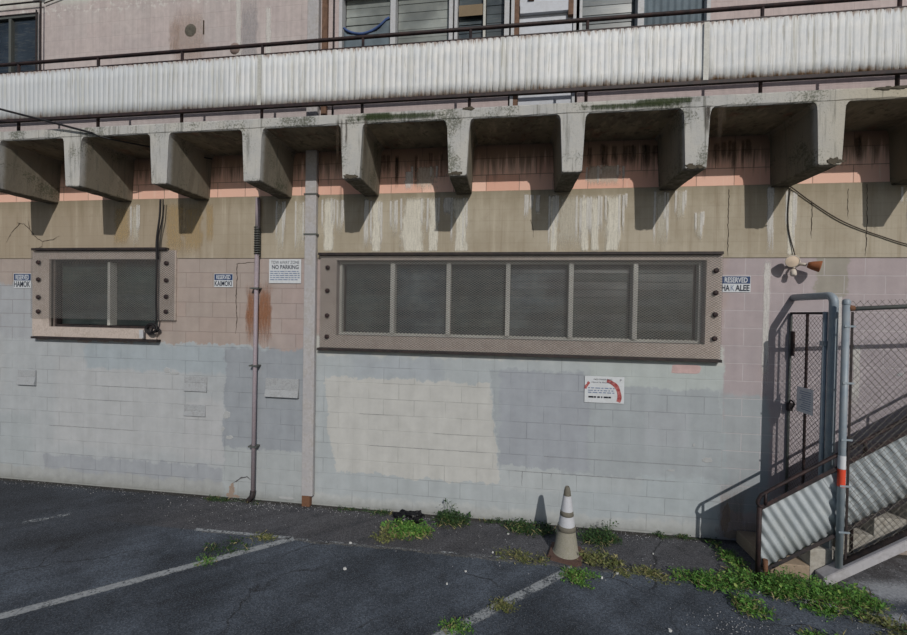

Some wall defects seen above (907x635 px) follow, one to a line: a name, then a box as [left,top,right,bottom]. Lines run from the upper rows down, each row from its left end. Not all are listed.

leakage [405,166,438,188]
leakage [321,199,344,251]
leakage [364,197,468,251]
leakage [524,194,628,251]
leakage [653,190,687,235]
corrosion [246,294,271,329]